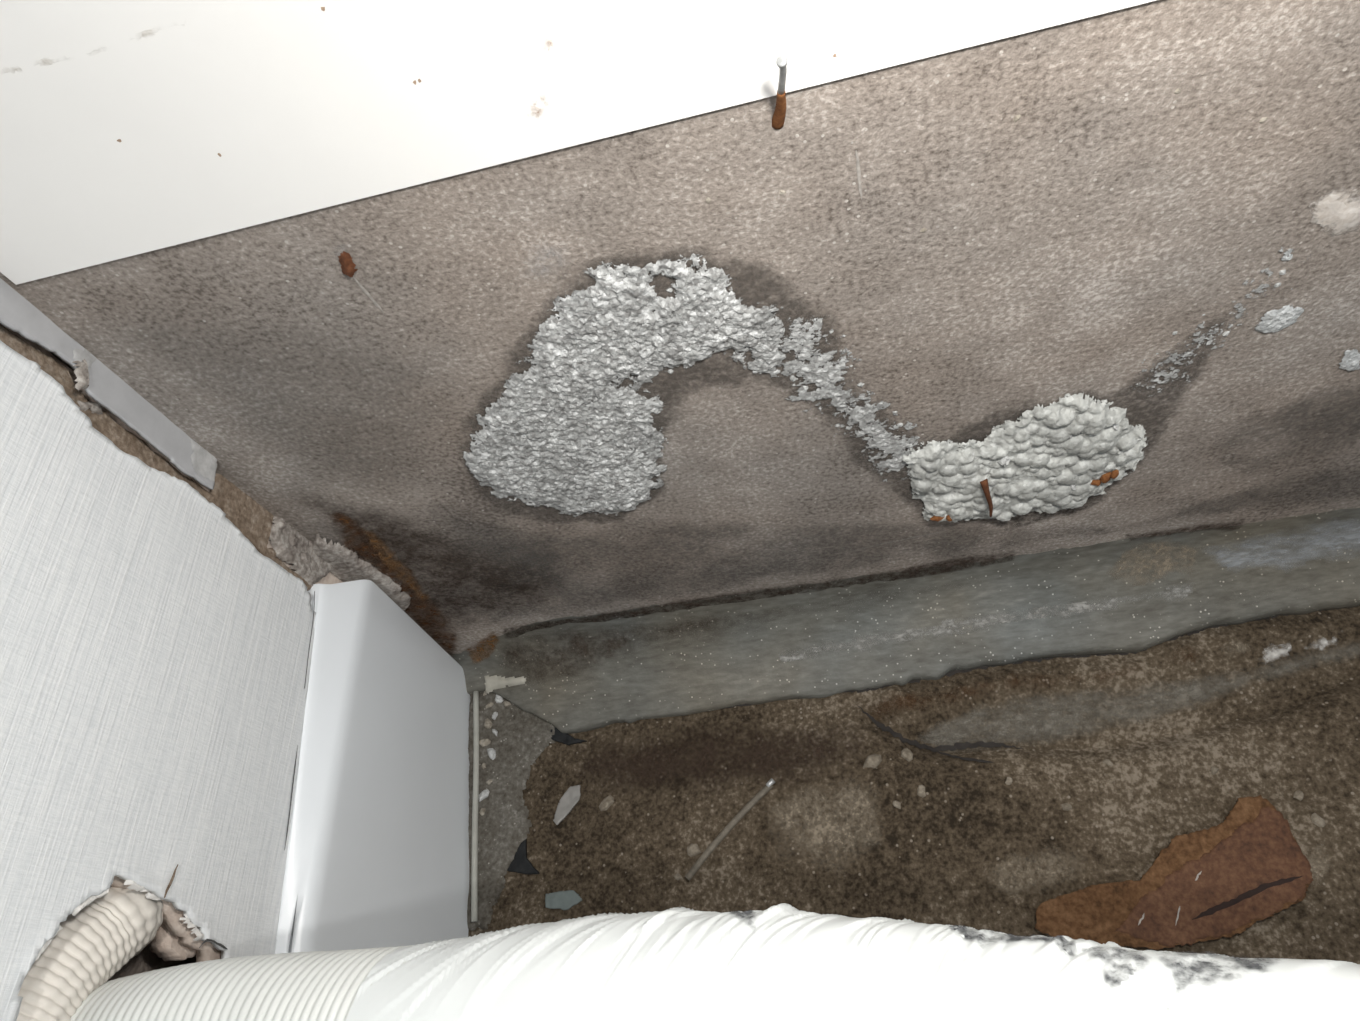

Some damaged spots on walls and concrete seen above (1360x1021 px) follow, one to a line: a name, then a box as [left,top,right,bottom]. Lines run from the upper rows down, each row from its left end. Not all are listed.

corrosion [338,251,384,313]
damp [343,515,1013,636]
damp [1118,501,1241,575]
damp [1218,525,1360,567]
damp [780,597,1119,662]
damp [1266,647,1291,660]